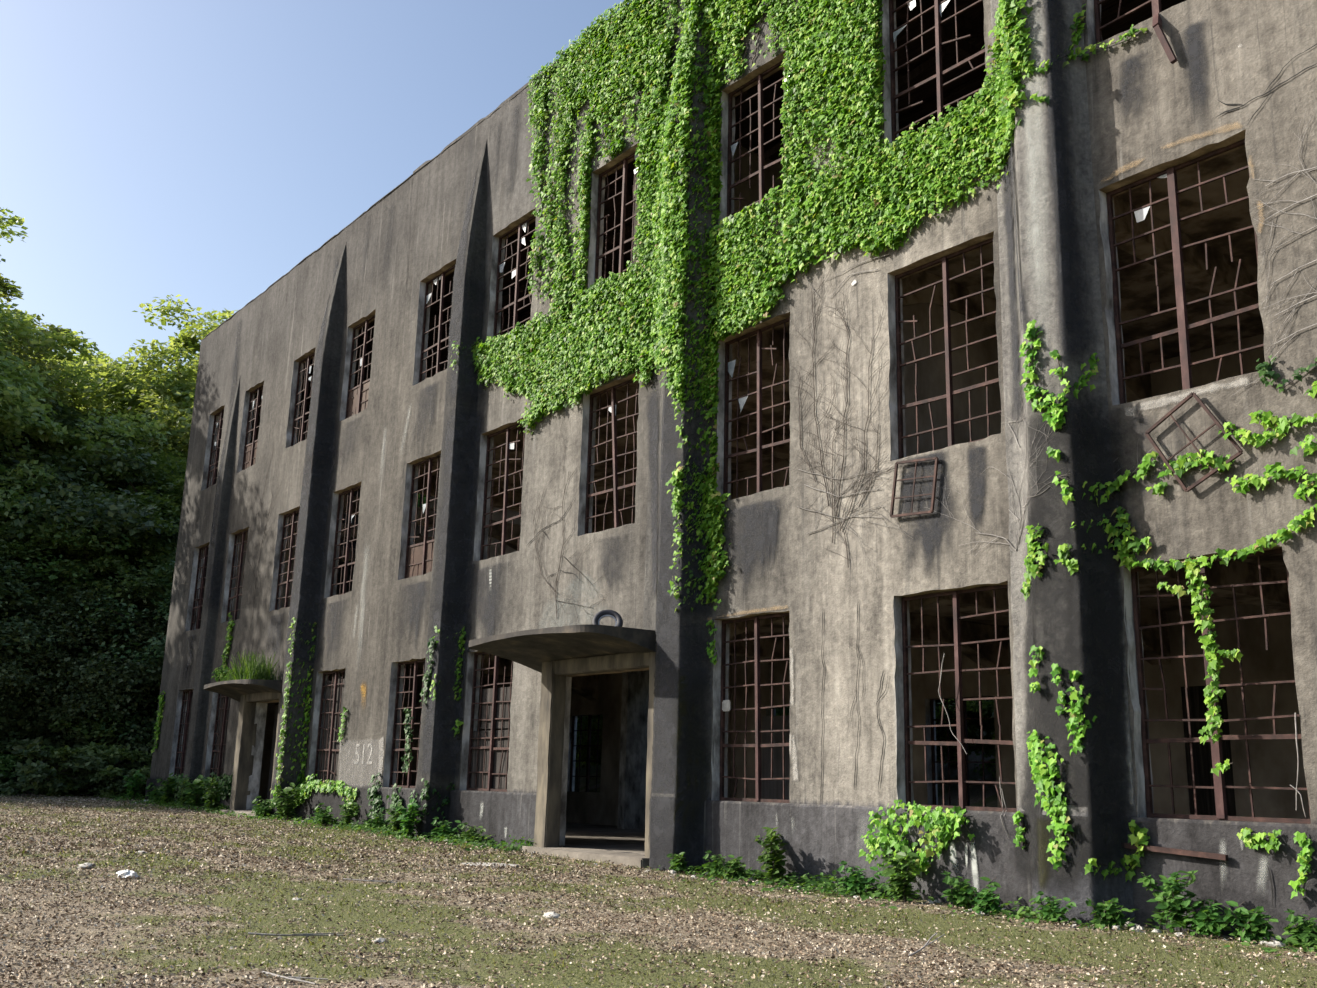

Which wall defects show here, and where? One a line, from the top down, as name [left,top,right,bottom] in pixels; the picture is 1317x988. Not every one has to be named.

damp [1120,56,1142,111]
damp [1184,22,1207,106]
damp [1030,0,1094,360]
damp [903,452,952,567]
damp [967,447,985,523]
damp [1002,140,1132,886]